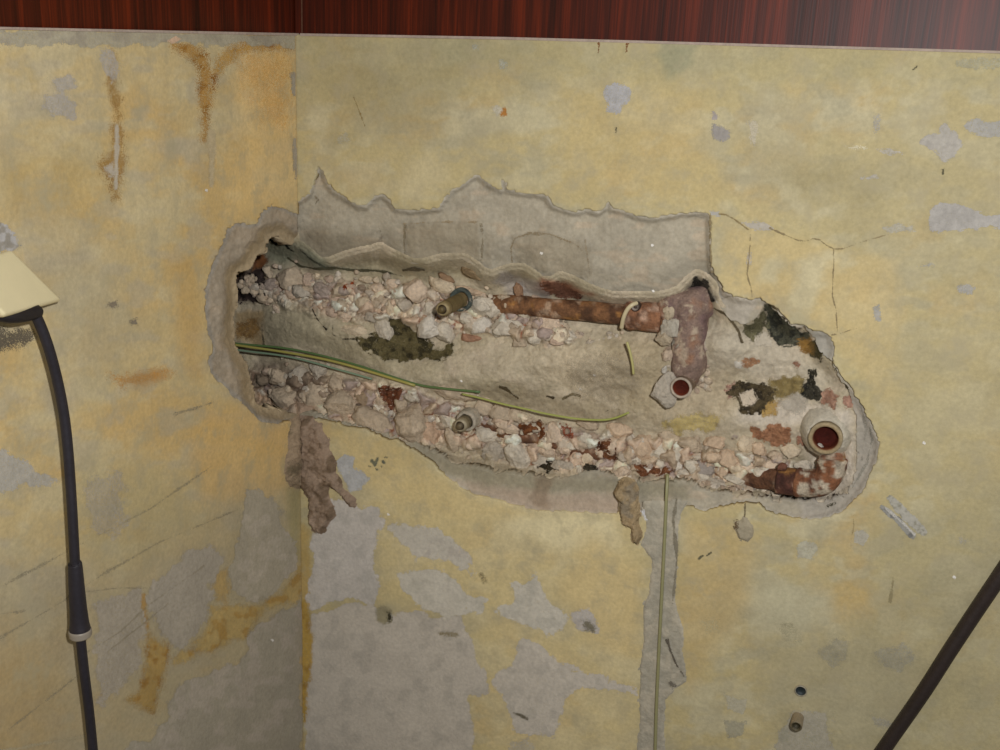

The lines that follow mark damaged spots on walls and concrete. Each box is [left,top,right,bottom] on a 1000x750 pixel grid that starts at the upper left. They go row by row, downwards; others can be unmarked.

damp [96,46,129,206]
damp [169,35,296,188]
crack [709,210,885,336]
peeling [919,118,1000,162]
peeling [929,202,1000,234]
spalling [205,167,880,546]
peeling [305,454,386,611]
damp [126,563,315,724]
peeling [396,567,638,739]